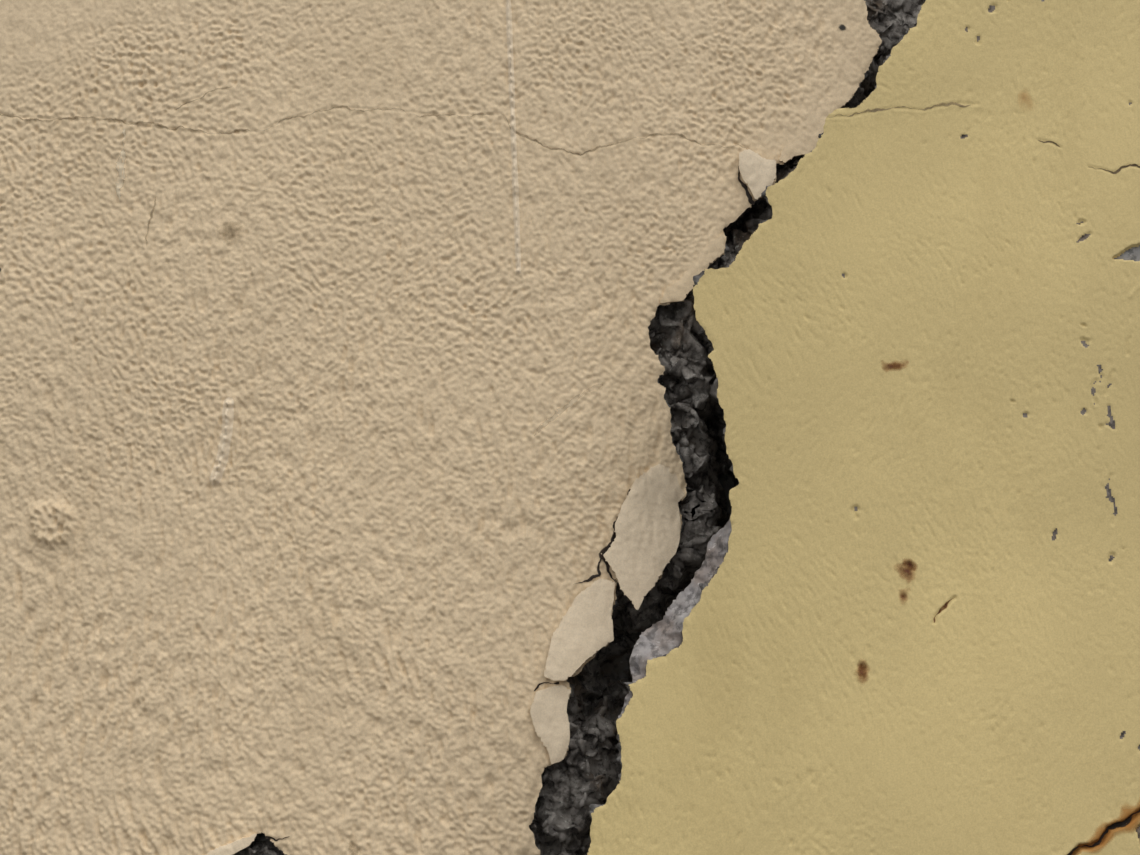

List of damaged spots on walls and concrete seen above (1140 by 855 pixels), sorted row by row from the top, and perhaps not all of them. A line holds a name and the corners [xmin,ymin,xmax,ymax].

crack [1092,164,1140,174]
crack [529,0,970,855]
crack [204,832,290,855]
crack [1067,810,1140,855]